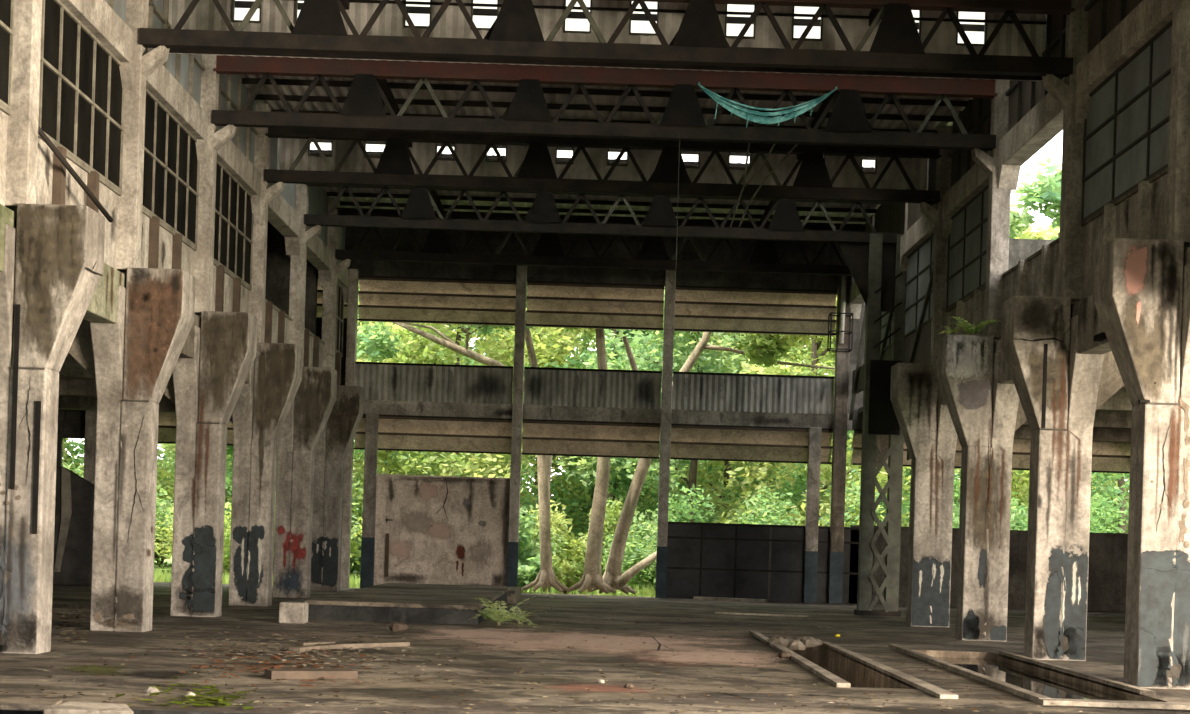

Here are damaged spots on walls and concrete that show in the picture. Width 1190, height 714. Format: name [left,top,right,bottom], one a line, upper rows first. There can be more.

peeling [1124,246,1148,324]
damp [1122,244,1179,400]
damp [909,373,931,428]
corrosion [1156,397,1181,515]